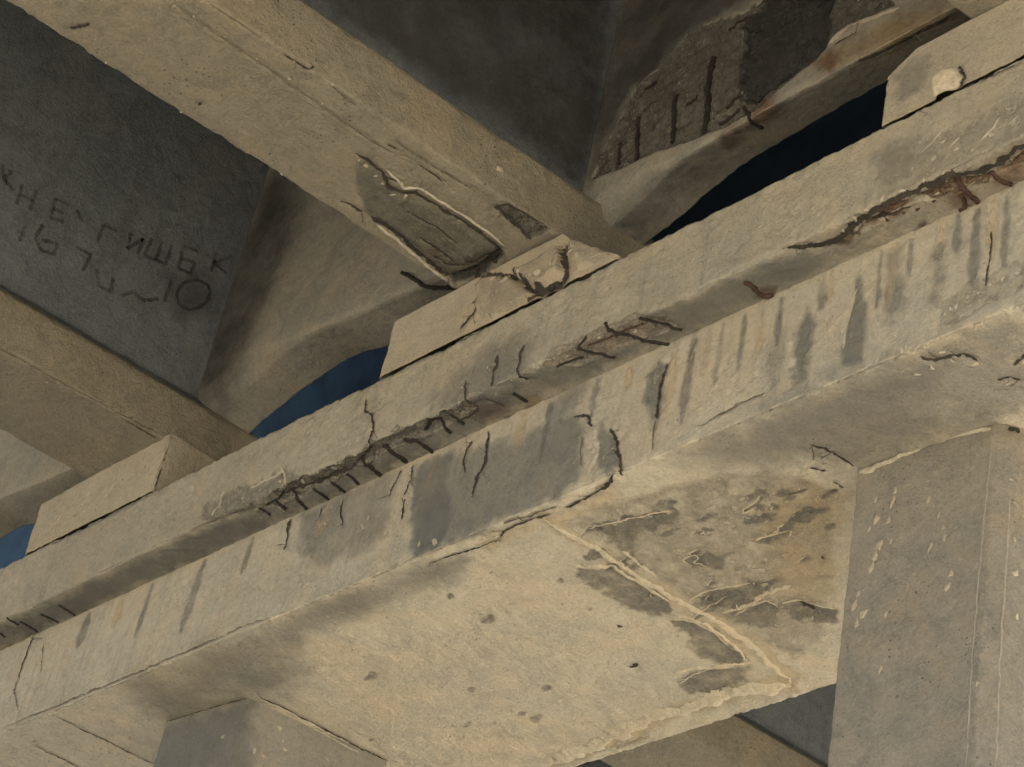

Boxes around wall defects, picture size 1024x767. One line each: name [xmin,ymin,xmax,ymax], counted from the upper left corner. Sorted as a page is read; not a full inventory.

spalling [592,0,894,179]
crack [174,3,579,379]
spalling [357,168,504,291]
damp [938,201,1009,290]
spalling [203,399,474,518]
crack [459,344,530,497]
crack [431,414,623,563]
spalling [536,313,682,370]
damp [795,315,814,381]
damp [766,363,940,443]
damp [843,286,890,364]
crack [913,351,1024,387]